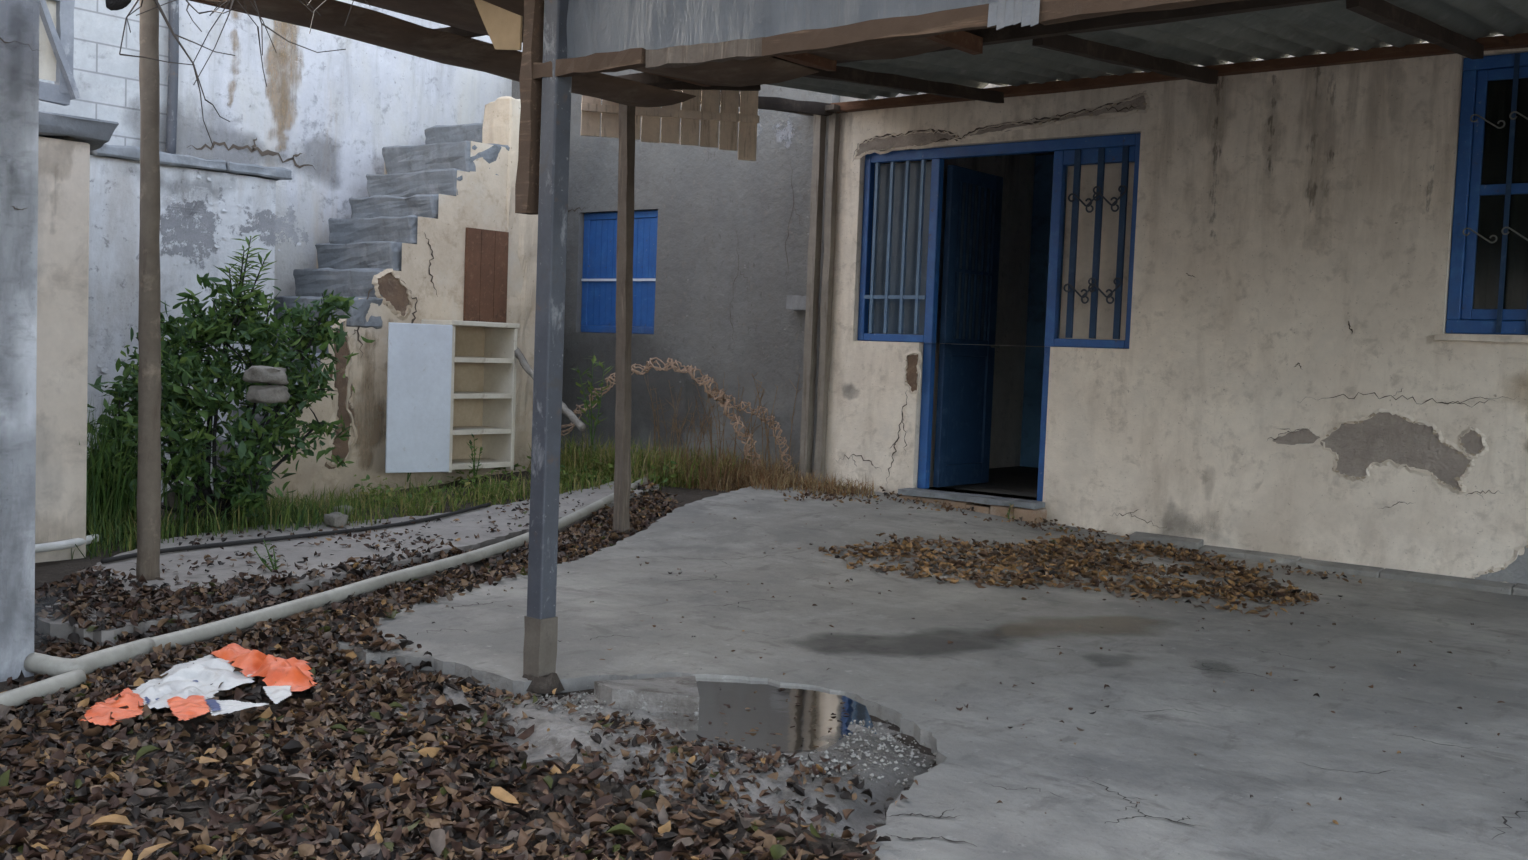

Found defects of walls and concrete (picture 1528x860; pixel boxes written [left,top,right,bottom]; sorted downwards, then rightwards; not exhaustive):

crack [188,138,315,169]
crack [853,93,1143,158]
peeling [160,186,309,269]
spalling [372,268,414,321]
crack [1268,363,1507,440]
spalling [1273,408,1489,495]
spalling [1472,541,1528,585]